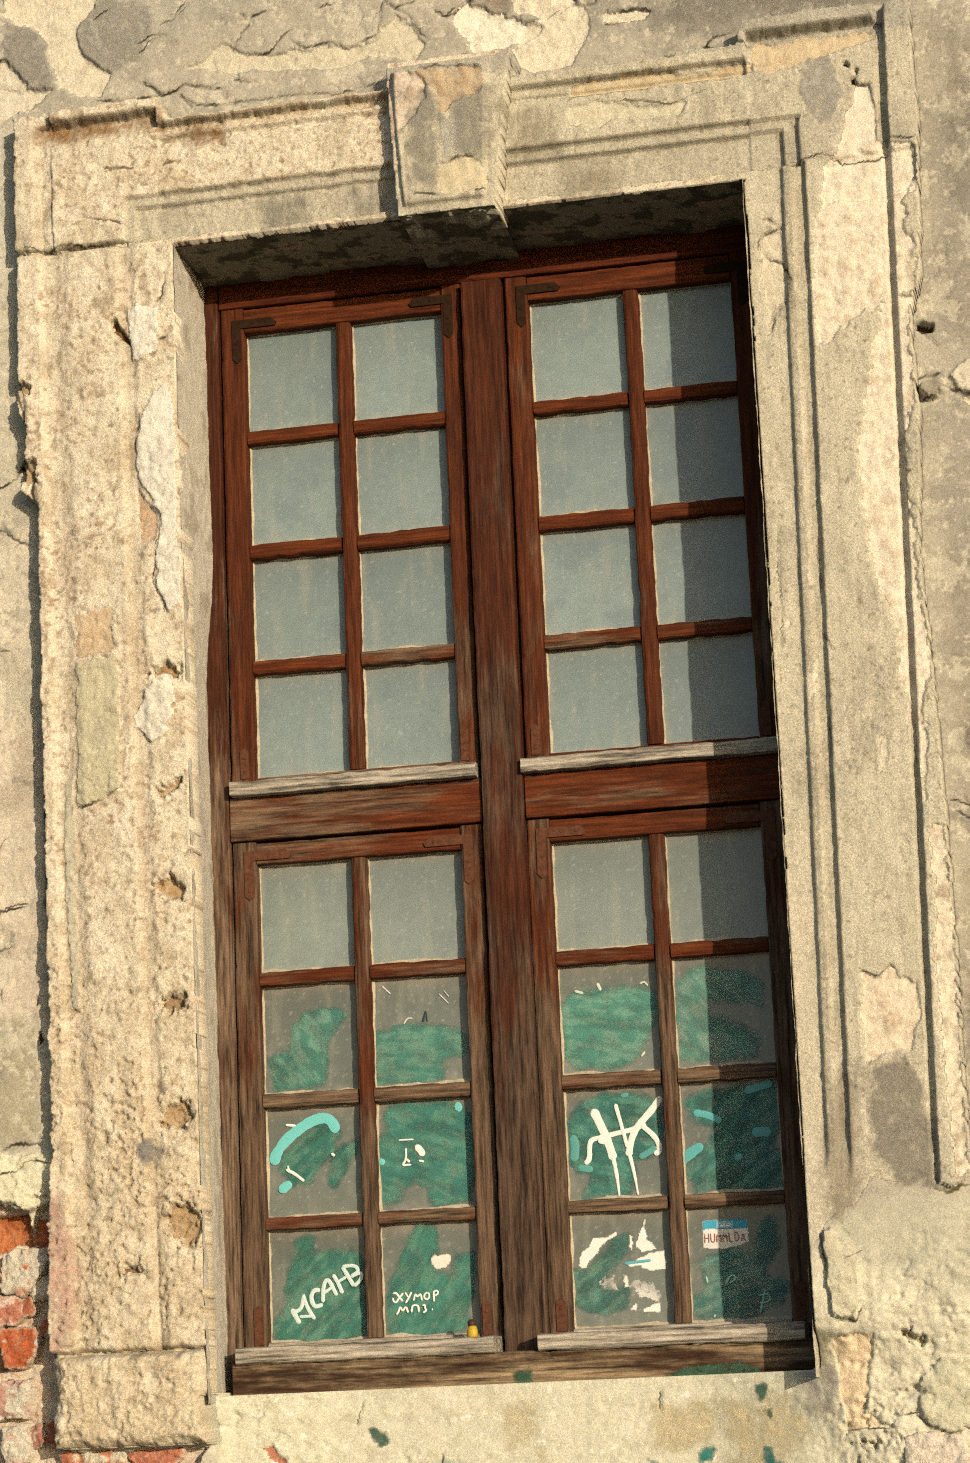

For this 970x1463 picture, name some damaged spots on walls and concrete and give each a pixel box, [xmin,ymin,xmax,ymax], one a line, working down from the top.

spalling [0,0,111,126]
crack [98,0,455,108]
spalling [187,0,649,140]
crack [0,460,36,501]
crack [18,385,26,425]
flaking render [135,383,180,609]
spalling [811,80,970,800]
crack [0,787,120,951]
spalling [860,824,970,1178]
crack [10,1140,40,1148]
flaking render [0,1152,209,1463]
spalling [820,1228,893,1448]